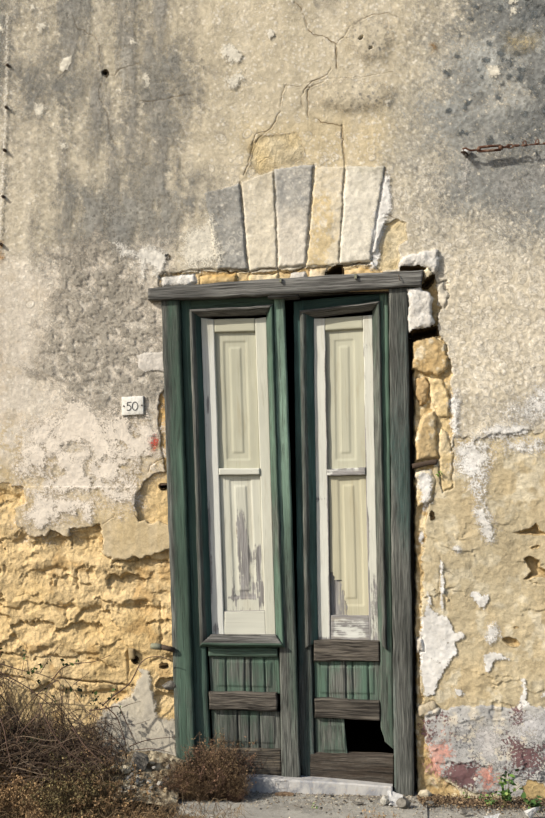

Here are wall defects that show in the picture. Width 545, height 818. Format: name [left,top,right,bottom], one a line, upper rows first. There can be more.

damp [14,0,210,440]
spalling [112,213,331,287]
crack [243,3,397,175]
damp [400,0,545,247]
spalling [0,389,175,758]
flaking render [343,219,545,802]